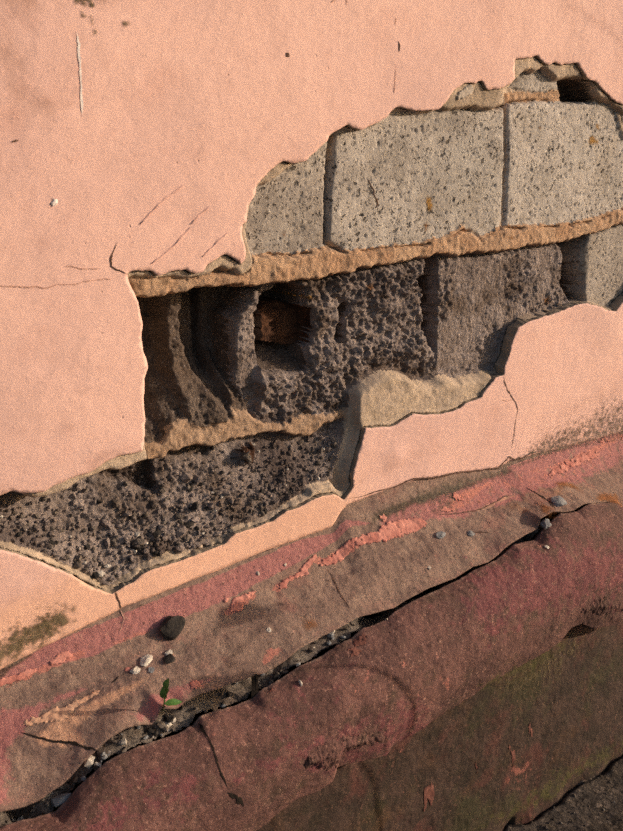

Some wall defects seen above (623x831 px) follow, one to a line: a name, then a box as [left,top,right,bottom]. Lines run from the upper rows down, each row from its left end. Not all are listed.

crack [0,244,127,289]
spalling [0,57,623,590]
crack [350,377,540,499]
mould [532,407,623,455]
crack [439,496,508,515]
peeling [223,590,256,613]
mould [0,607,76,665]
crack [0,524,543,828]